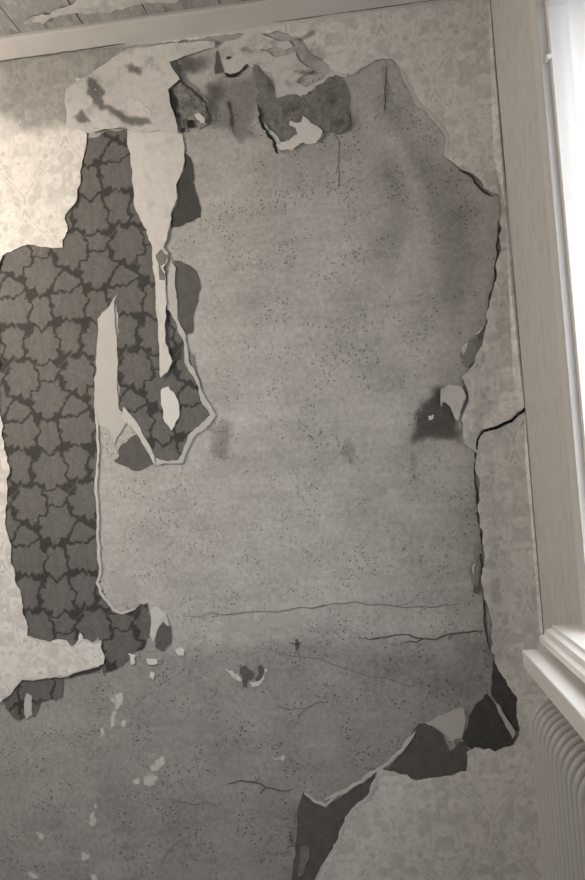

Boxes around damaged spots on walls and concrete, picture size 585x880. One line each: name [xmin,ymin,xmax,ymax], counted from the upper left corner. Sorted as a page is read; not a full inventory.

peeling [23,0,179,25]
peeling [65,40,215,139]
spalling [253,65,352,154]
flaking render [460,325,486,368]
crack [475,407,525,459]
peeling [94,411,136,614]
flaking render [469,541,484,593]
crack [190,601,460,617]
crack [360,630,483,643]
peeling [380,732,415,770]
flaking render [425,708,466,742]
peeling [324,767,380,859]